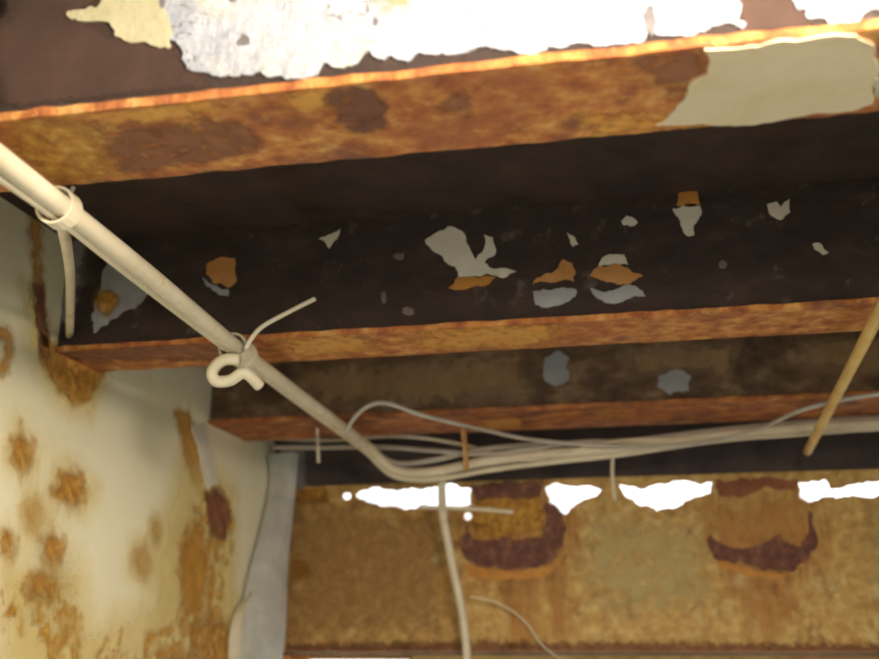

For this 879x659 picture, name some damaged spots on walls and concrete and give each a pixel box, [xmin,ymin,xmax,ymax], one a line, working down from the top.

peeling [66,0,746,80]
peeling [792,0,879,25]
rust [14,100,225,182]
rust [578,113,698,137]
peeling [92,263,148,333]
rust [29,216,220,404]
peeling [425,226,516,290]
peeling [533,259,577,308]
peeling [590,254,645,304]
rust [50,470,86,506]
rust [135,409,234,659]
damp [284,500,879,651]